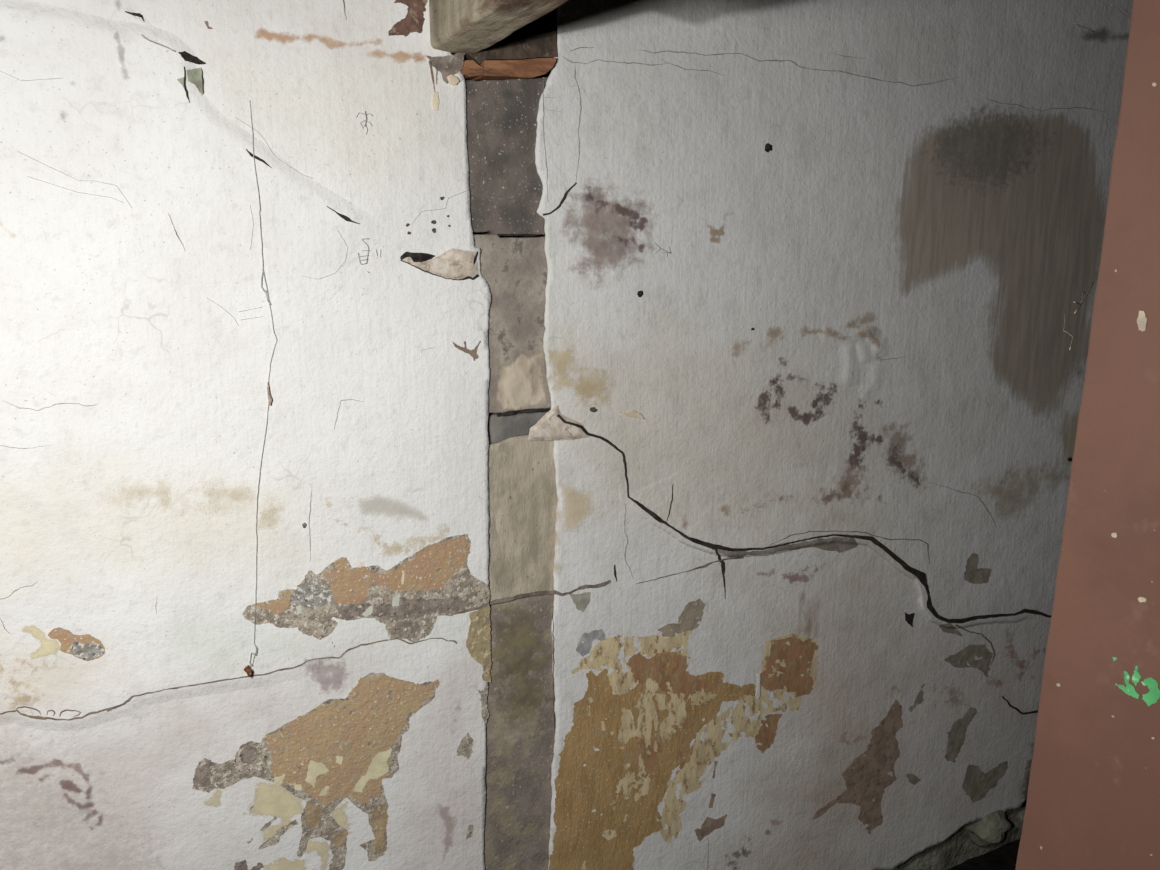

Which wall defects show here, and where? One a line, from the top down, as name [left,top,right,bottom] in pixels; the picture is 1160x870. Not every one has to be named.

damp [567,189,648,268]
damp [901,116,1106,412]
peeling [23,625,105,661]
peeling [192,672,440,870]
peeling [243,534,492,723]
crack [0,414,1052,734]
peeling [549,598,819,870]
peeling [812,684,925,834]
peeling [945,707,1008,803]